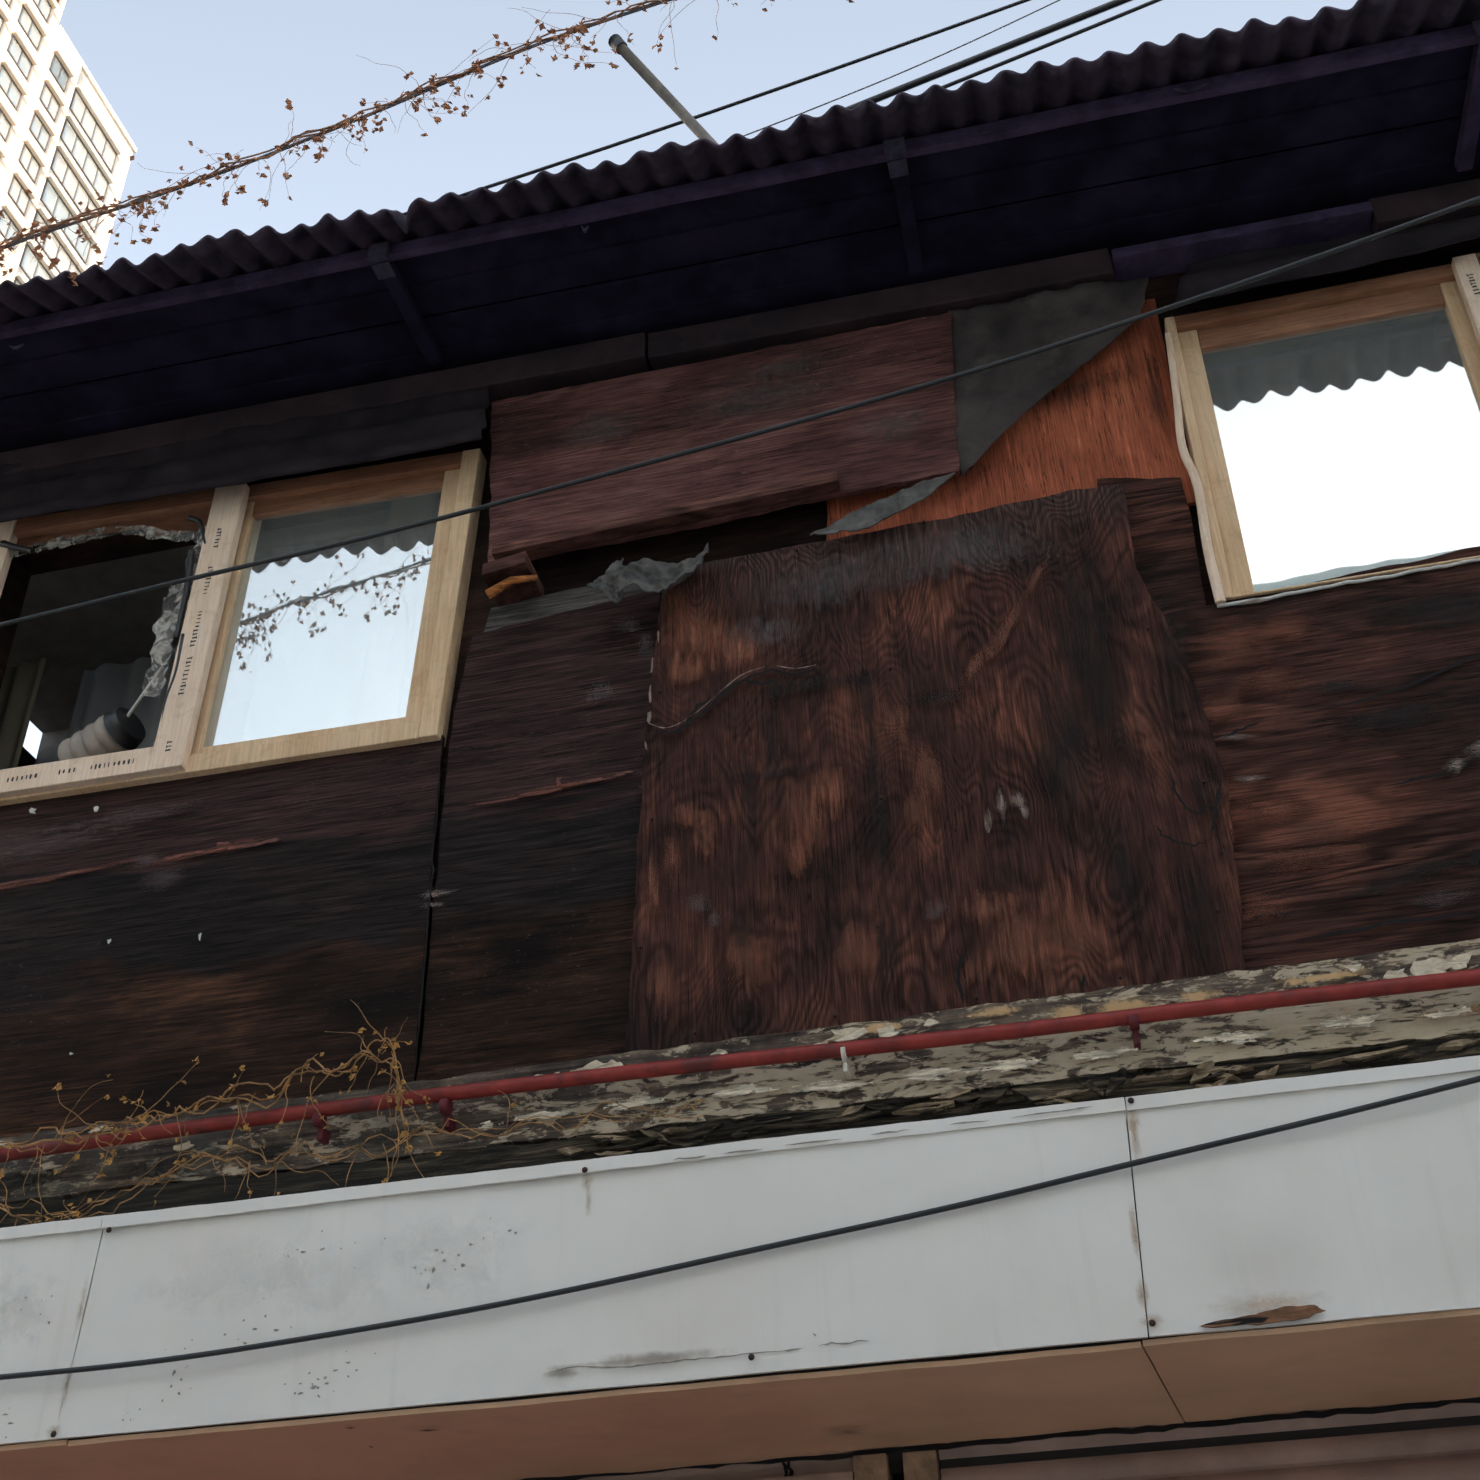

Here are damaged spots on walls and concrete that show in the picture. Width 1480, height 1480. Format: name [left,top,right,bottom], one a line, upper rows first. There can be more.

peeling [1284,964,1362,985]
peeling [1383,951,1472,979]
peeling [967,1006,1018,1017]
peeling [1052,999,1150,1018]
peeling [814,1023,902,1045]
peeling [1193,1030,1272,1046]
peeling [1072,1045,1138,1060]
peeling [535,1059,624,1076]
peeling [713,1055,1049,1098]
peeling [603,1095,666,1110]
peeling [478,1110,572,1130]
corrosion [1199,1305,1326,1328]